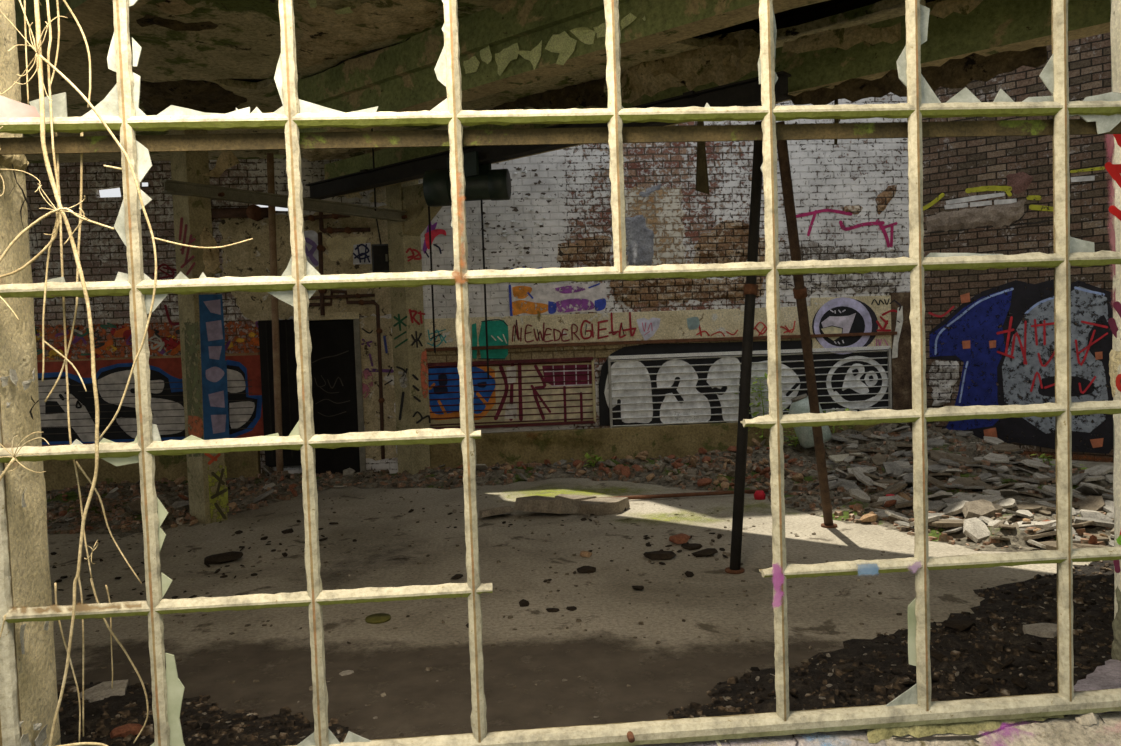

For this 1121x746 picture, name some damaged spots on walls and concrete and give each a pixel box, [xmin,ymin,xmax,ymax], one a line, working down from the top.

peeling [463,23,606,76]
spalling [620,29,760,103]
spalling [487,78,608,110]
spalling [844,204,863,215]
spalling [875,185,897,215]
spalling [470,167,765,307]
spalling [779,241,904,296]